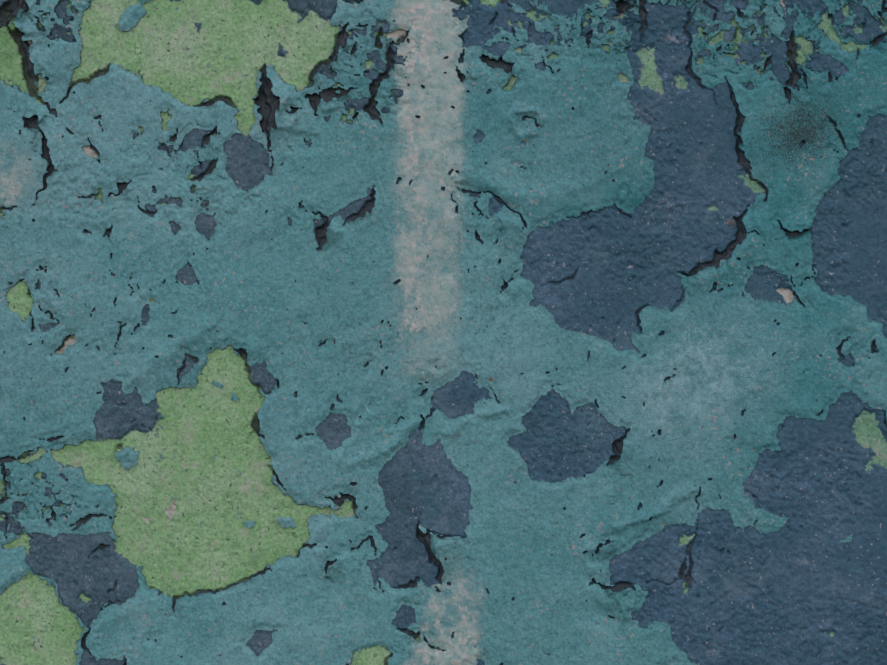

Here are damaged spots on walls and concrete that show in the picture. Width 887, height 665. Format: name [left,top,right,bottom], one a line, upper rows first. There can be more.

peeling [5,265,60,332]
crack [0,0,104,222]
crack [82,226,120,246]
crack [78,180,157,217]
peeling [195,208,217,240]
peeling [59,0,420,201]
crack [638,0,655,46]
peeling [450,0,887,358]
peeling [0,341,365,665]
peeling [350,371,500,652]
peeling [507,383,641,483]
peeling [589,390,887,665]